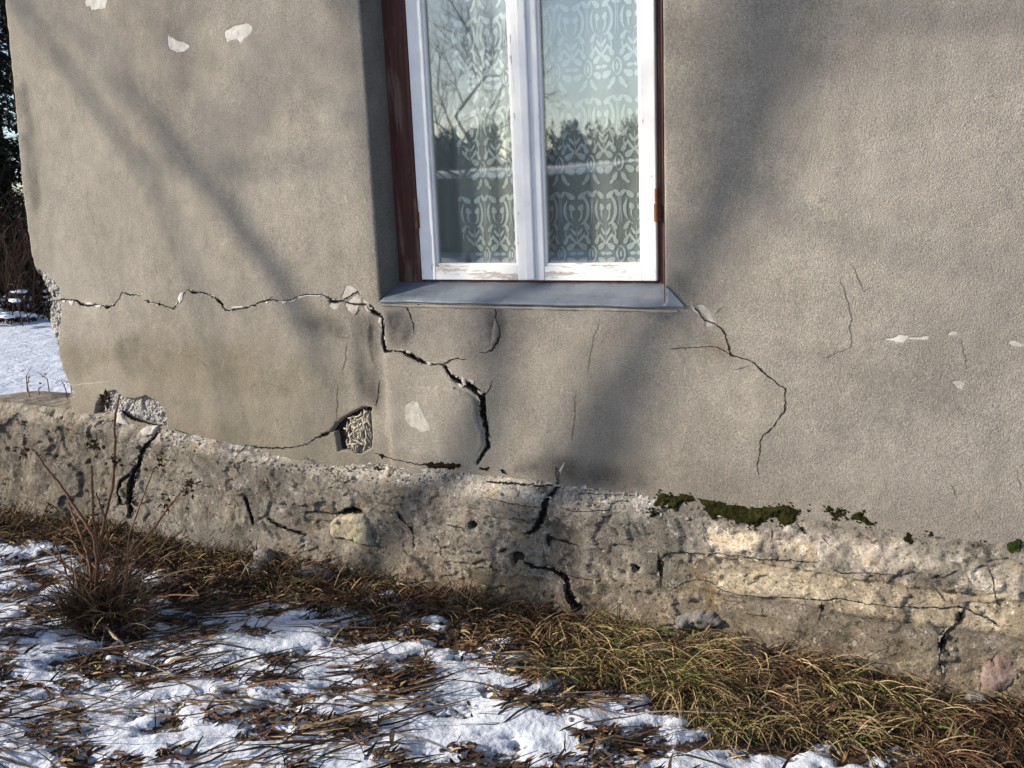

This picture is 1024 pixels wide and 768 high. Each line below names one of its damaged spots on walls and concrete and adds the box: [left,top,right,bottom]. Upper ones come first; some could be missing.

peeling [168,35,189,52]
peeling [225,23,252,43]
flaking render [105,390,314,467]
crack [61,289,635,608]
flaking render [310,407,662,516]
crack [671,305,786,475]
peeling [874,335,928,345]
crack [649,523,1001,676]